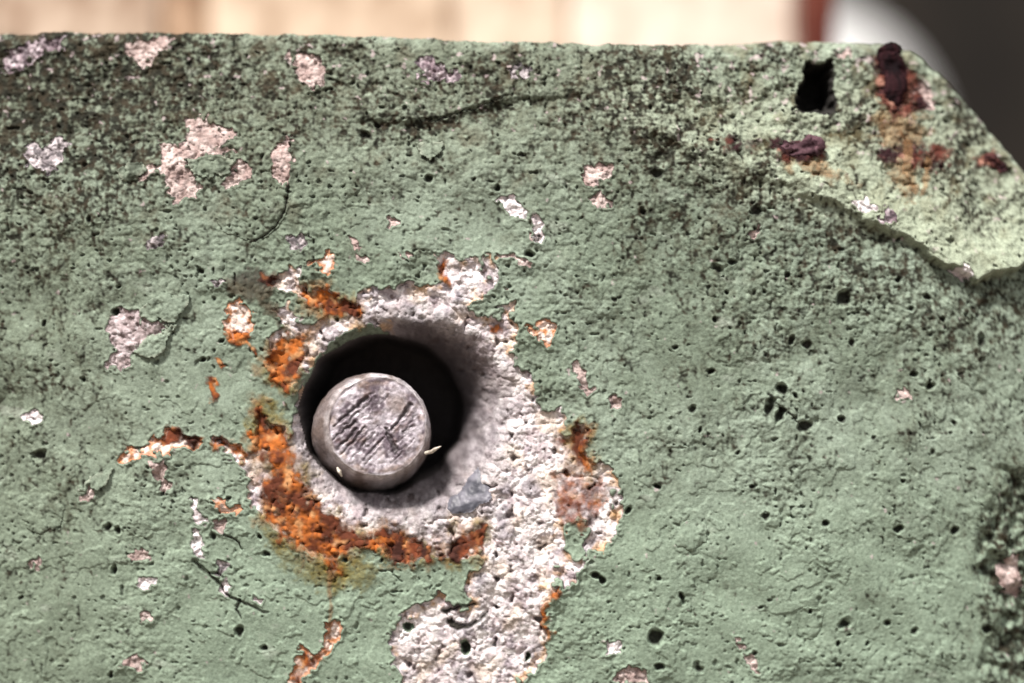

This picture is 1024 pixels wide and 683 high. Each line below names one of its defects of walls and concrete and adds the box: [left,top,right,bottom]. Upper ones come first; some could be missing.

peeling [125,36,175,69]
peeling [285,49,326,91]
peeling [23,136,72,176]
peeling [116,113,252,205]
rust [873,56,952,193]
peeling [495,194,544,243]
rust [301,284,362,321]
rust [227,331,309,394]
rust [154,401,488,595]
spalling [78,250,624,683]
rust [557,423,602,531]
crack [194,561,263,615]